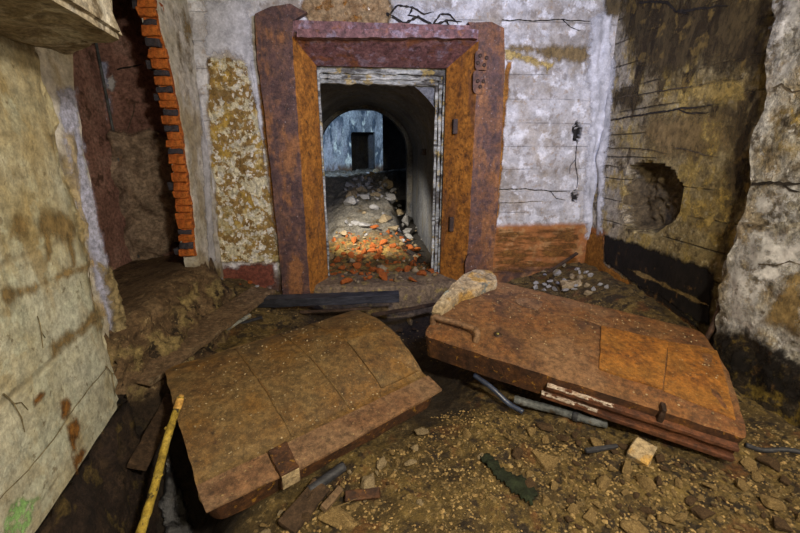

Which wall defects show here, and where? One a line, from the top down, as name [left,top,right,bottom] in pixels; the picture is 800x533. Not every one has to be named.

crack [386,4,462,25]
water stain [199,100,216,261]
water stain [204,0,265,139]
rust [257,65,277,234]
water stain [509,45,591,62]
crack [603,147,716,168]
crack [610,78,742,121]
water stain [605,0,775,257]
water stain [38,211,95,280]
water stain [2,284,38,303]